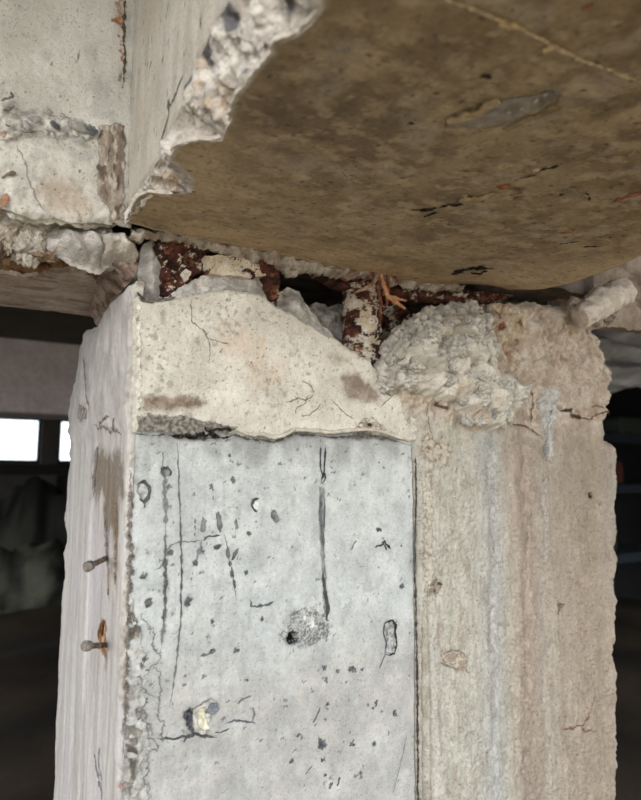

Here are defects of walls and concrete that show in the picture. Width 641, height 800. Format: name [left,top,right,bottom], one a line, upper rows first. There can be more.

spalling [446,90,561,131]
spalling [0,0,323,326]
corrosion [309,274,352,291]
crack [137,292,228,360]
corrosion [373,284,532,373]
damp [145,396,202,410]
spalling [137,413,237,436]
spalling [356,417,386,430]
crack [512,362,541,436]
crack [559,405,609,429]
crack [83,356,432,800]
corrosion [97,618,107,667]